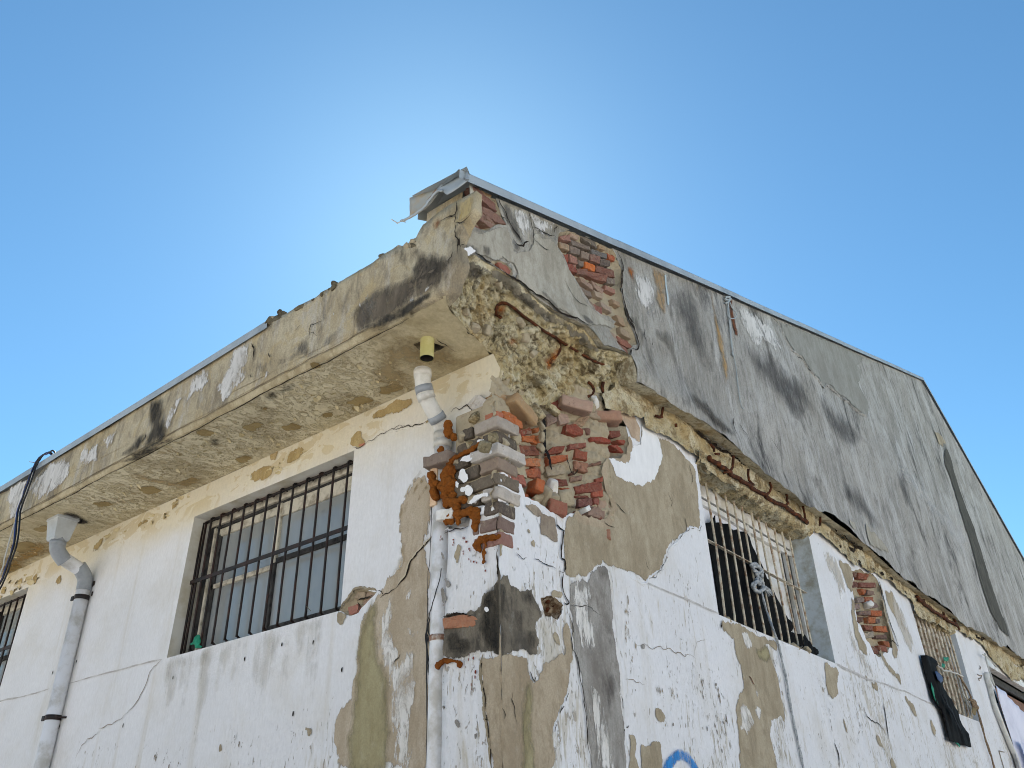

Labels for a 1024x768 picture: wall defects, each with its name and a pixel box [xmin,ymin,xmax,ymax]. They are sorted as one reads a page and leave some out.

spalling [265,281,339,326]
damp [354,251,447,330]
damp [125,346,248,462]
peeling [298,360,412,419]
spalling [334,186,703,768]
crack [378,526,468,598]
damp [443,570,542,659]
flaking render [824,529,958,690]
crack [81,659,162,746]
peeling [692,617,812,768]